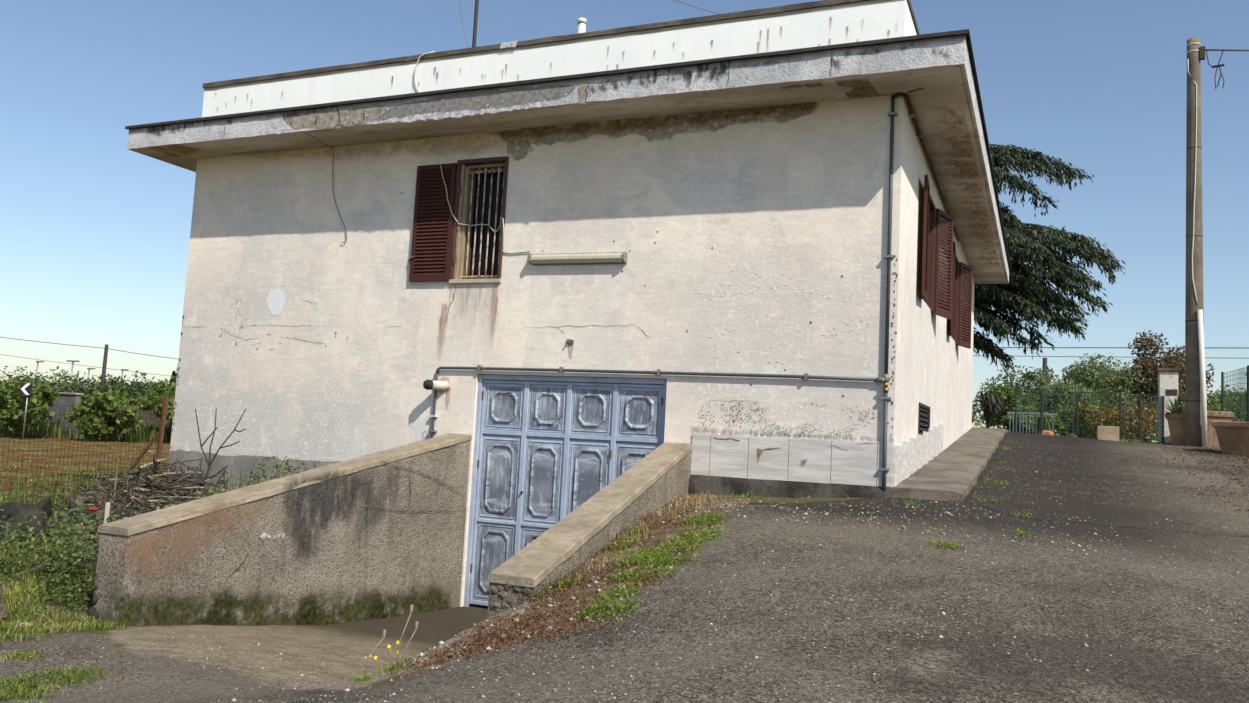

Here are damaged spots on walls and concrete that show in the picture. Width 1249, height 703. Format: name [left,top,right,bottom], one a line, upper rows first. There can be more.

peeling [266,81,601,134]
peeling [698,400,893,440]
damp [287,473,392,554]
spalling [487,584,534,612]